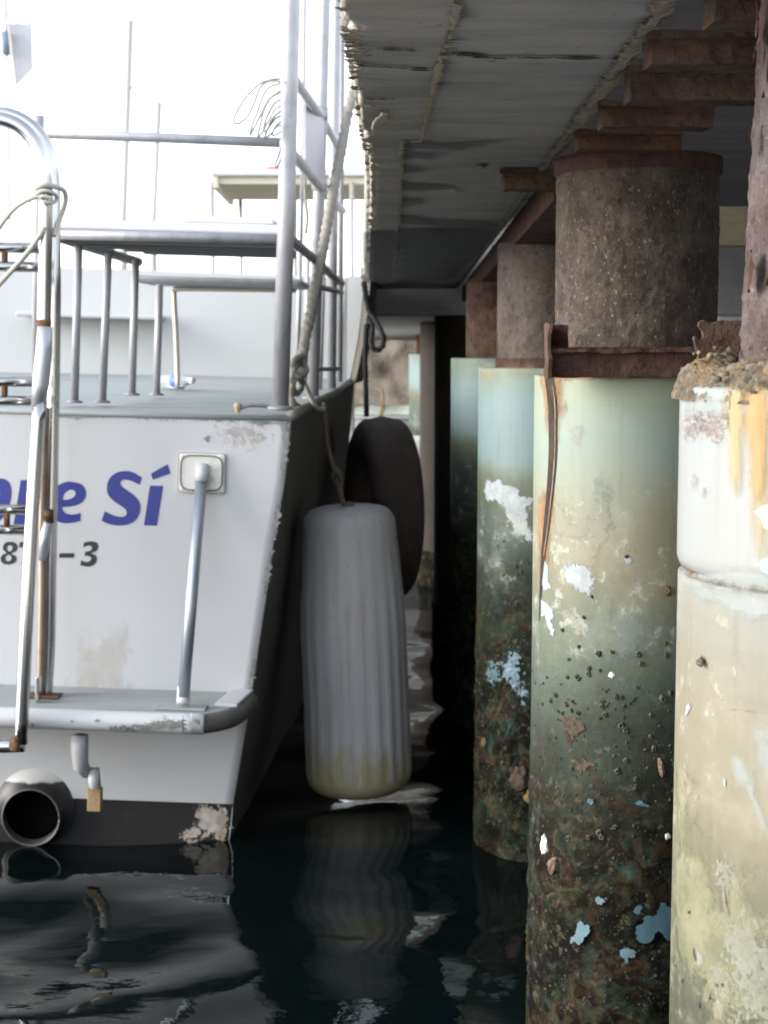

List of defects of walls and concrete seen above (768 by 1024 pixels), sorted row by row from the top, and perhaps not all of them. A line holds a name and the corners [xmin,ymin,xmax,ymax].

corrosion [542,376,592,421]
spalling [671,346,768,448]
corrosion [729,389,768,545]
peeling [484,479,533,543]
corrosion [538,494,552,561]
peeling [541,561,581,636]
peeling [562,562,596,596]
peeling [485,651,529,706]
peeling [570,921,590,945]
peeling [620,903,671,964]